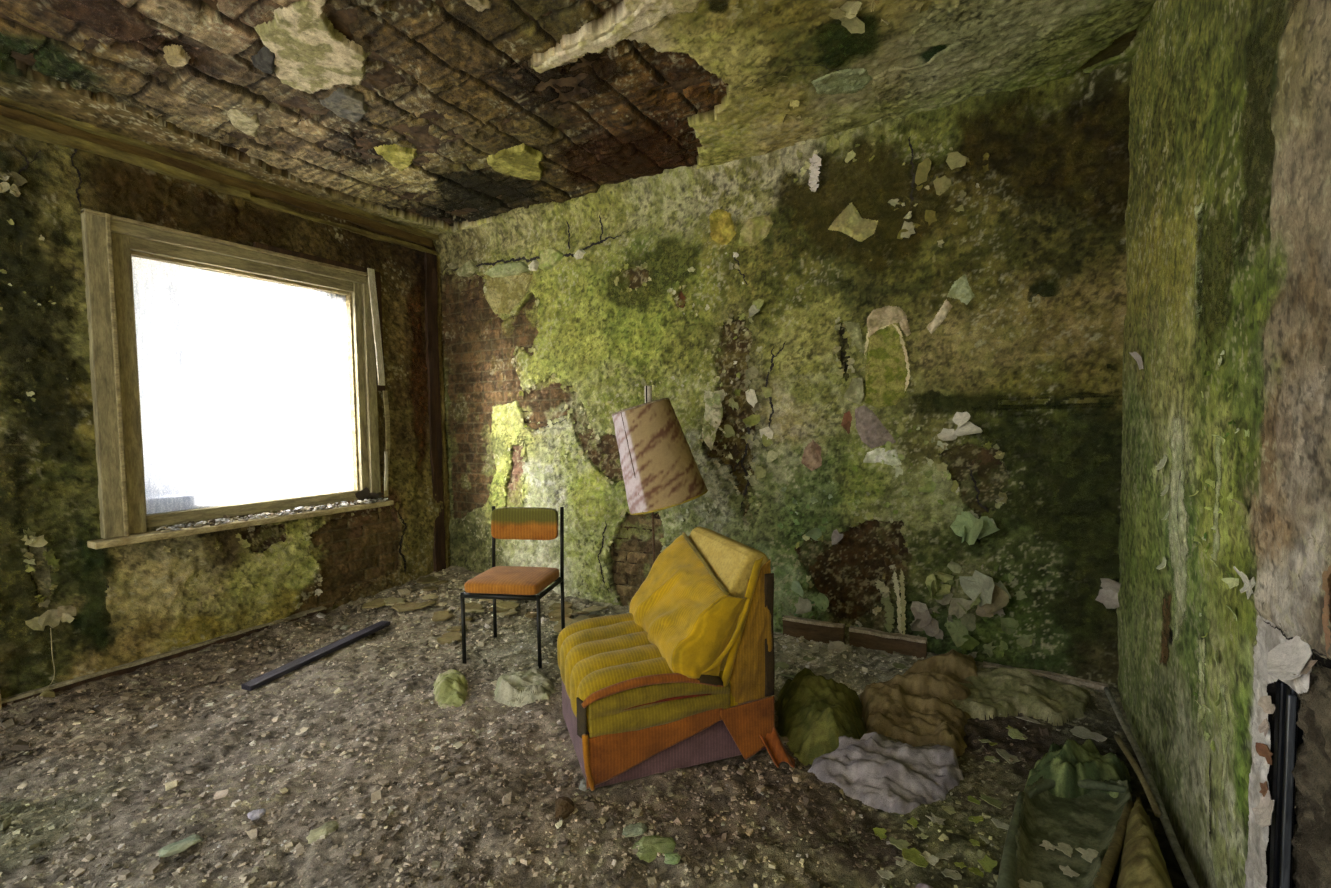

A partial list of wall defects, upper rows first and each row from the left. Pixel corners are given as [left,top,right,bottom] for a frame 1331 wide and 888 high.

leakage [0,148,93,672]
flaking render [105,502,407,658]
crack [447,215,629,271]
flaking render [442,270,684,519]
leakage [509,52,630,109]
peeling [530,0,703,73]
leakage [555,129,692,184]
flaking render [602,209,778,606]
flaking render [777,306,1009,676]
leakage [777,82,1130,276]
flaking render [910,274,1119,397]
leakage [911,390,1123,661]